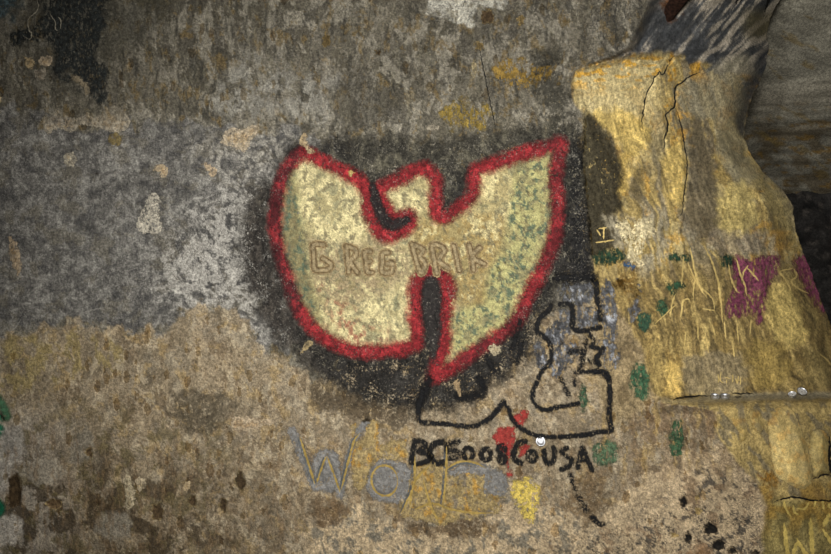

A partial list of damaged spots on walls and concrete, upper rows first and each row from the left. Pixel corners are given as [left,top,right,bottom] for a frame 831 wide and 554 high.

crack [641,56,700,220]
crack [813,437,831,479]
crack [775,495,831,503]